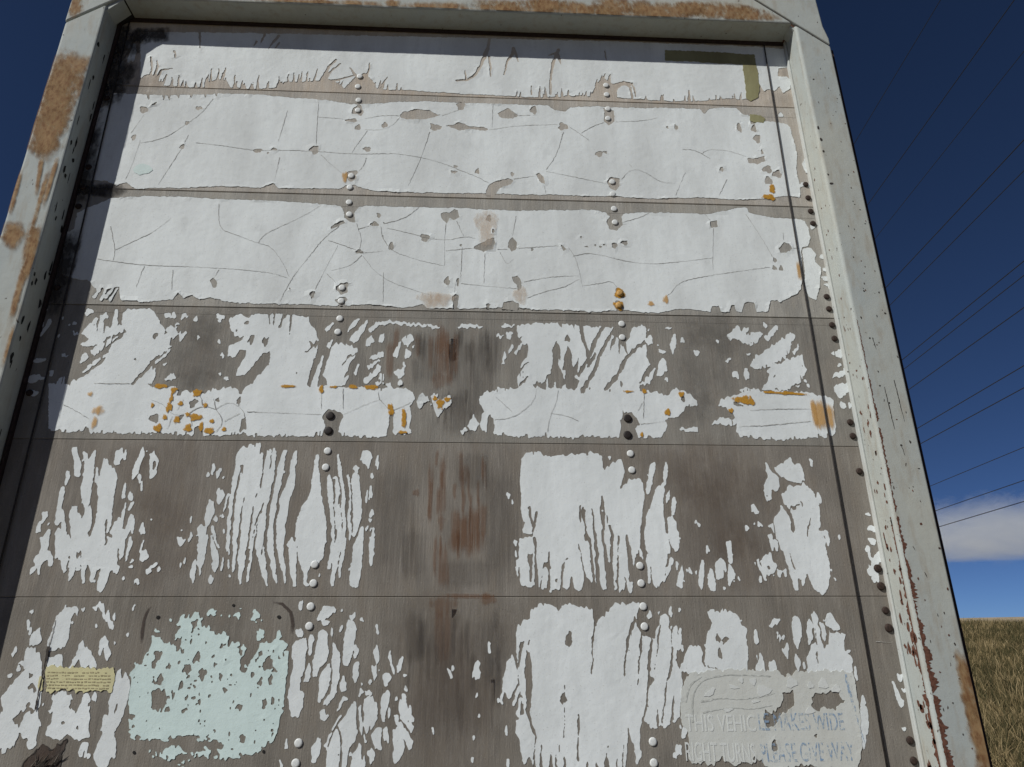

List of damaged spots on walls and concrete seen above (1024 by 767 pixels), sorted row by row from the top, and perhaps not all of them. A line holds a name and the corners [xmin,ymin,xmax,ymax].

rust [3,53,89,315]
crack [125,99,486,182]
peeling [77,44,795,184]
crack [101,206,784,299]
crack [490,109,655,192]
rust [151,383,226,434]
peeling [10,242,871,595]
peeling [0,447,414,767]
peeling [472,642,491,680]
peeling [497,451,858,767]
rust [856,319,955,767]
rust [955,654,990,767]